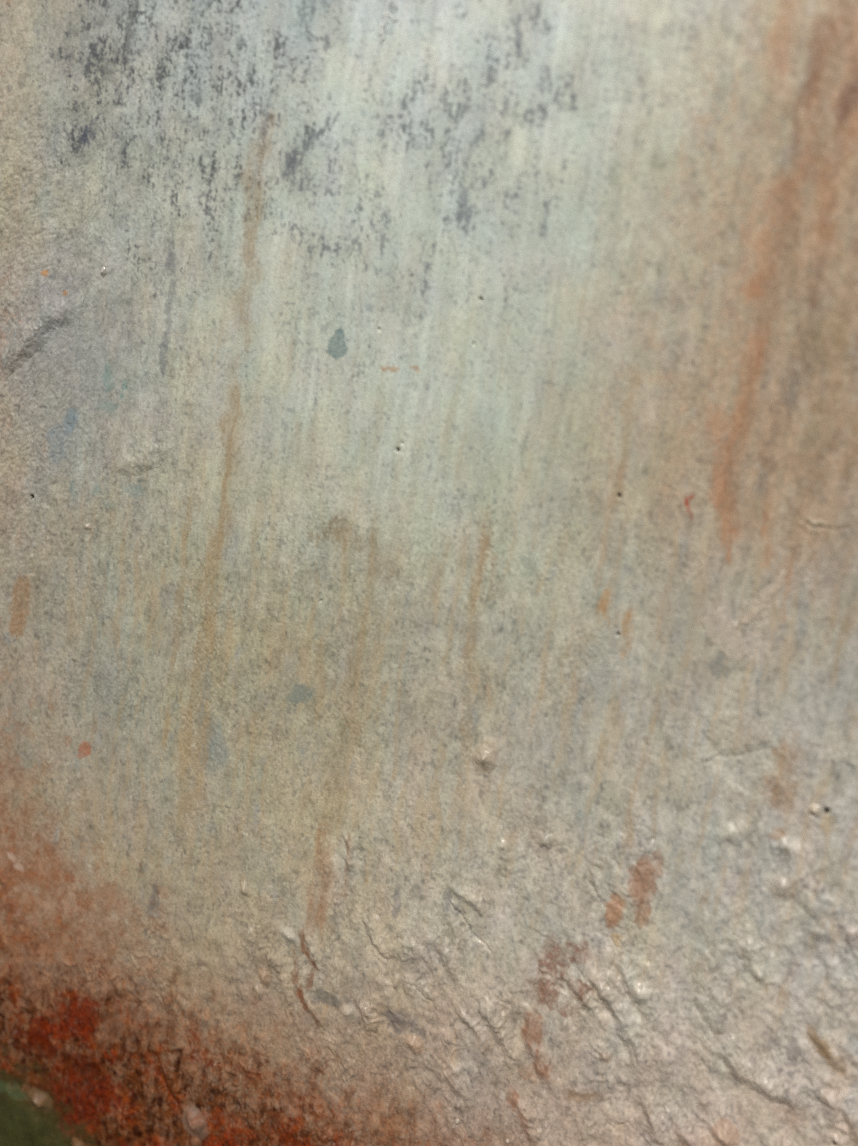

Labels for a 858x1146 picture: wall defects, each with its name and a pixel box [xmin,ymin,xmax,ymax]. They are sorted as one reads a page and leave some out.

water stain [0,0,665,511]
corrosion [594,582,636,663]
corrosion [0,501,596,1146]
corrosion [562,1087,605,1104]
corrosion [759,1100,819,1134]